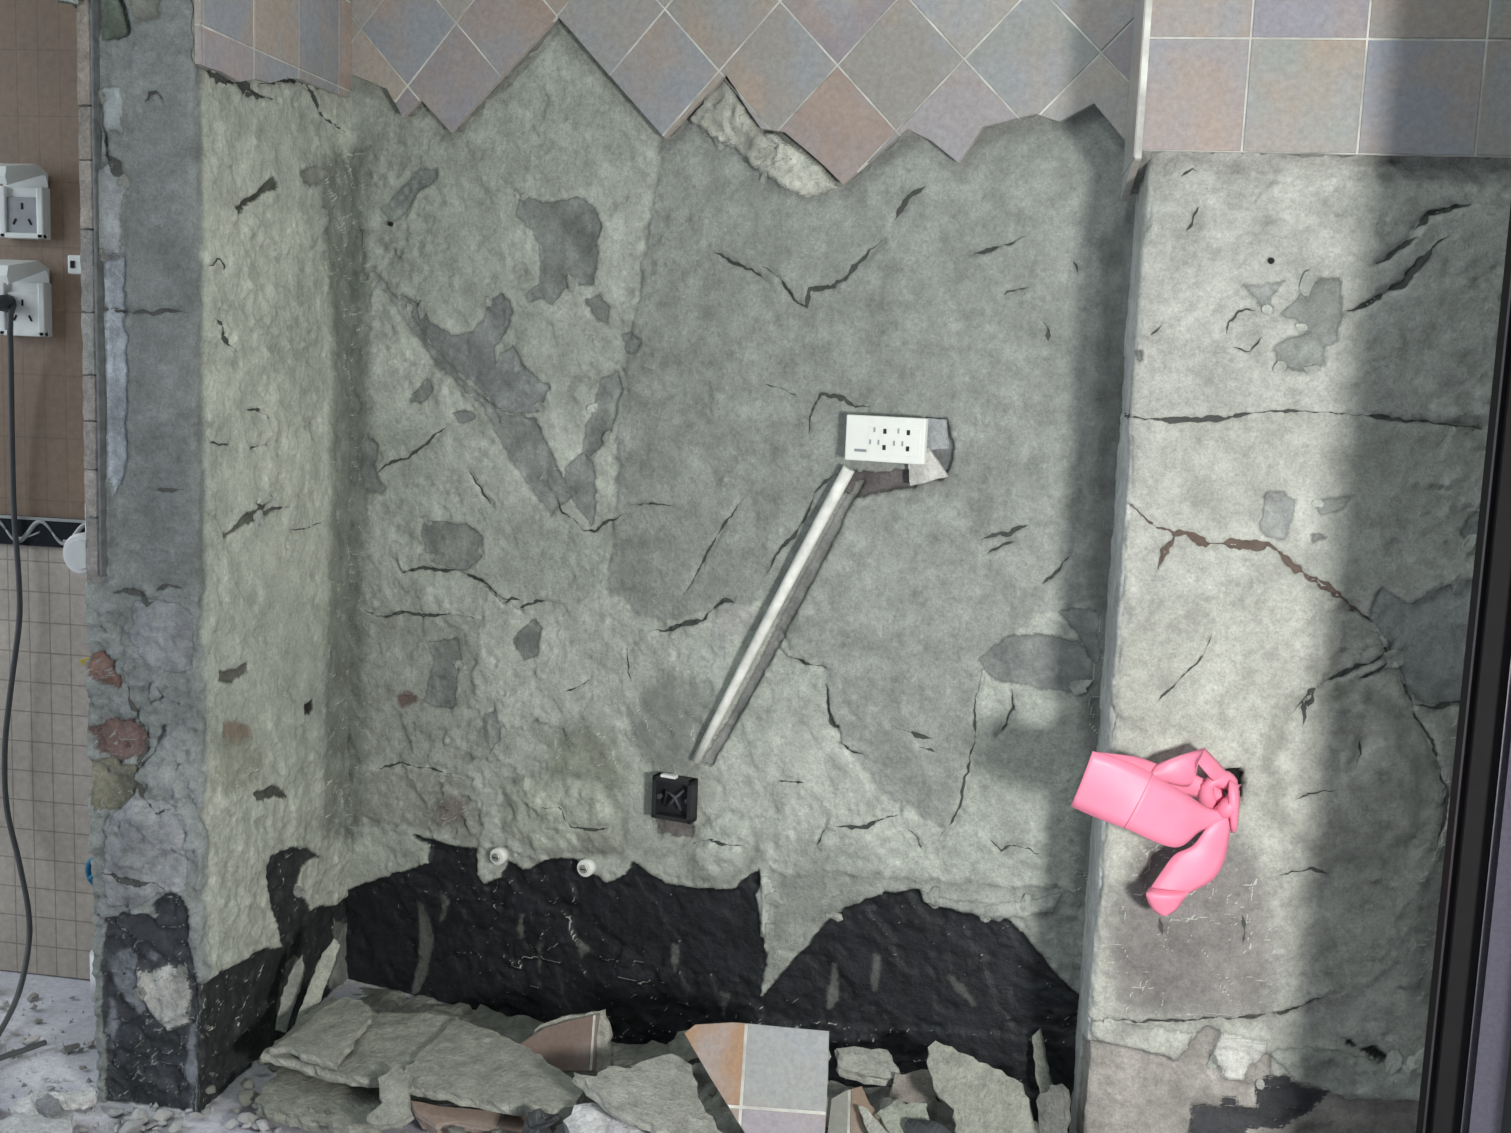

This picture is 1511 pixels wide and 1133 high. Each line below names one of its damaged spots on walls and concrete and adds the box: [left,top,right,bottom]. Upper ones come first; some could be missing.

spalling [690,78,838,198]
spalling [401,189,610,414]
crack [714,184,929,309]
crack [1346,204,1471,311]
crack [1124,409,1479,429]
crack [627,503,744,682]
spalling [979,608,1101,695]
crack [1131,504,1460,859]
crack [817,675,1015,851]
peeling [921,886,1062,922]
peeling [132,964,191,1030]
spalling [1077,1017,1424,1133]